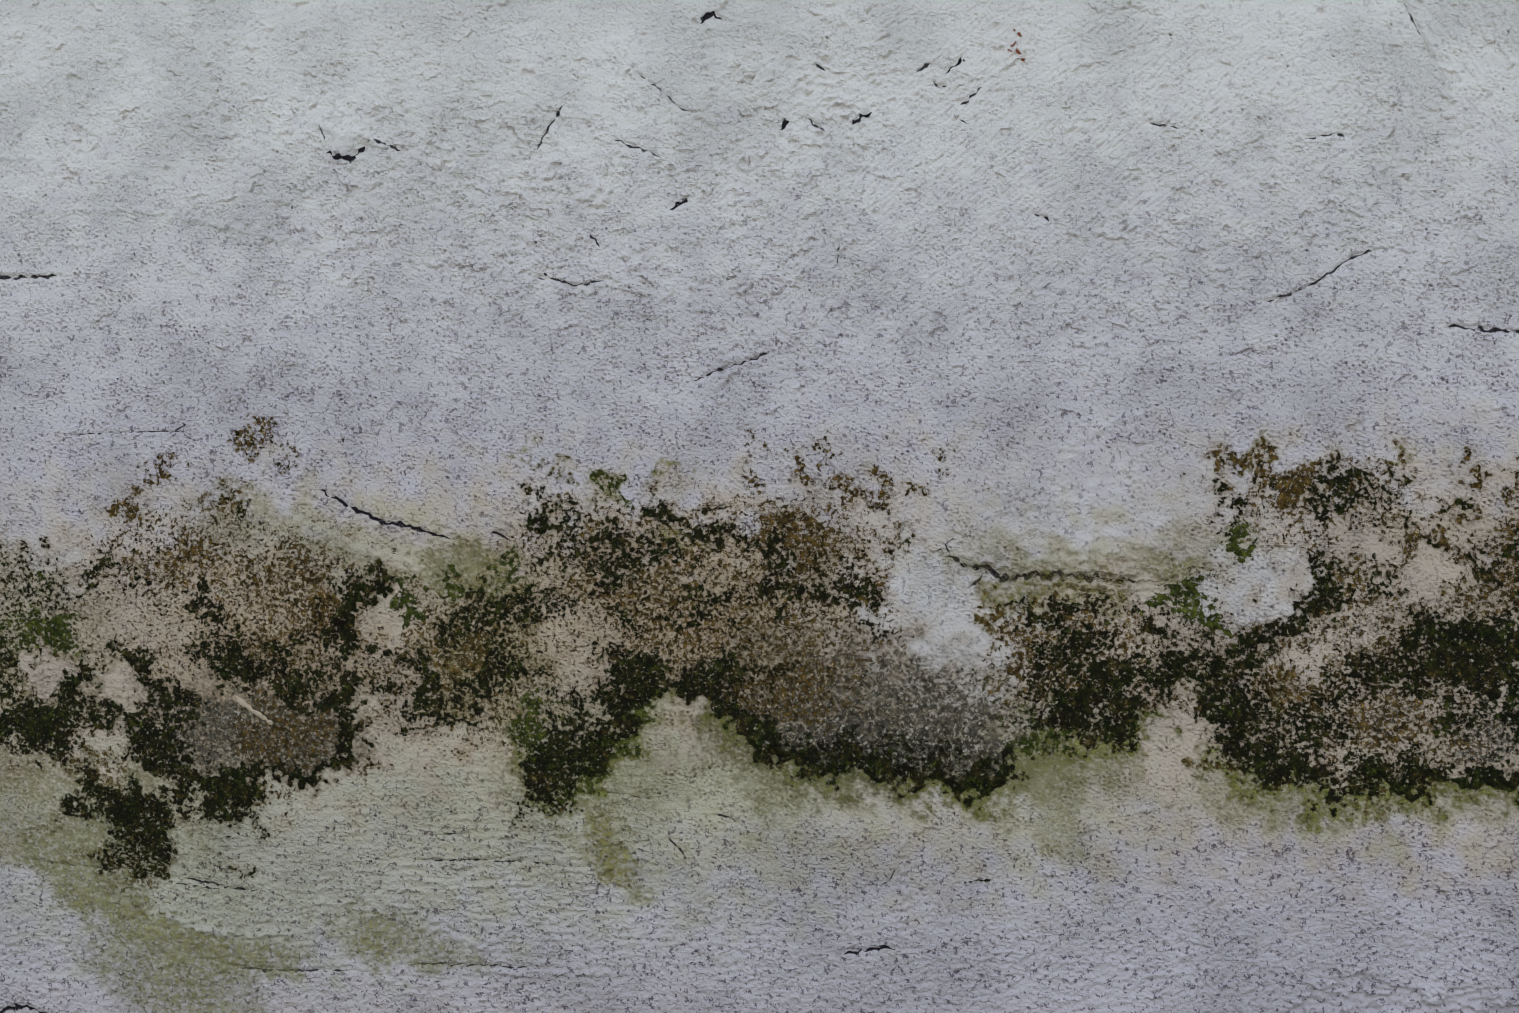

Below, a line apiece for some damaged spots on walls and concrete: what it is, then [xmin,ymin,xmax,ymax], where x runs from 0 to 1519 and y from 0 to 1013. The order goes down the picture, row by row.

crack [0,273,60,281]
water stain [227,413,299,475]
crack [310,483,508,539]
crack [937,538,1174,592]
water stain [0,430,1519,830]
water stain [65,840,170,894]